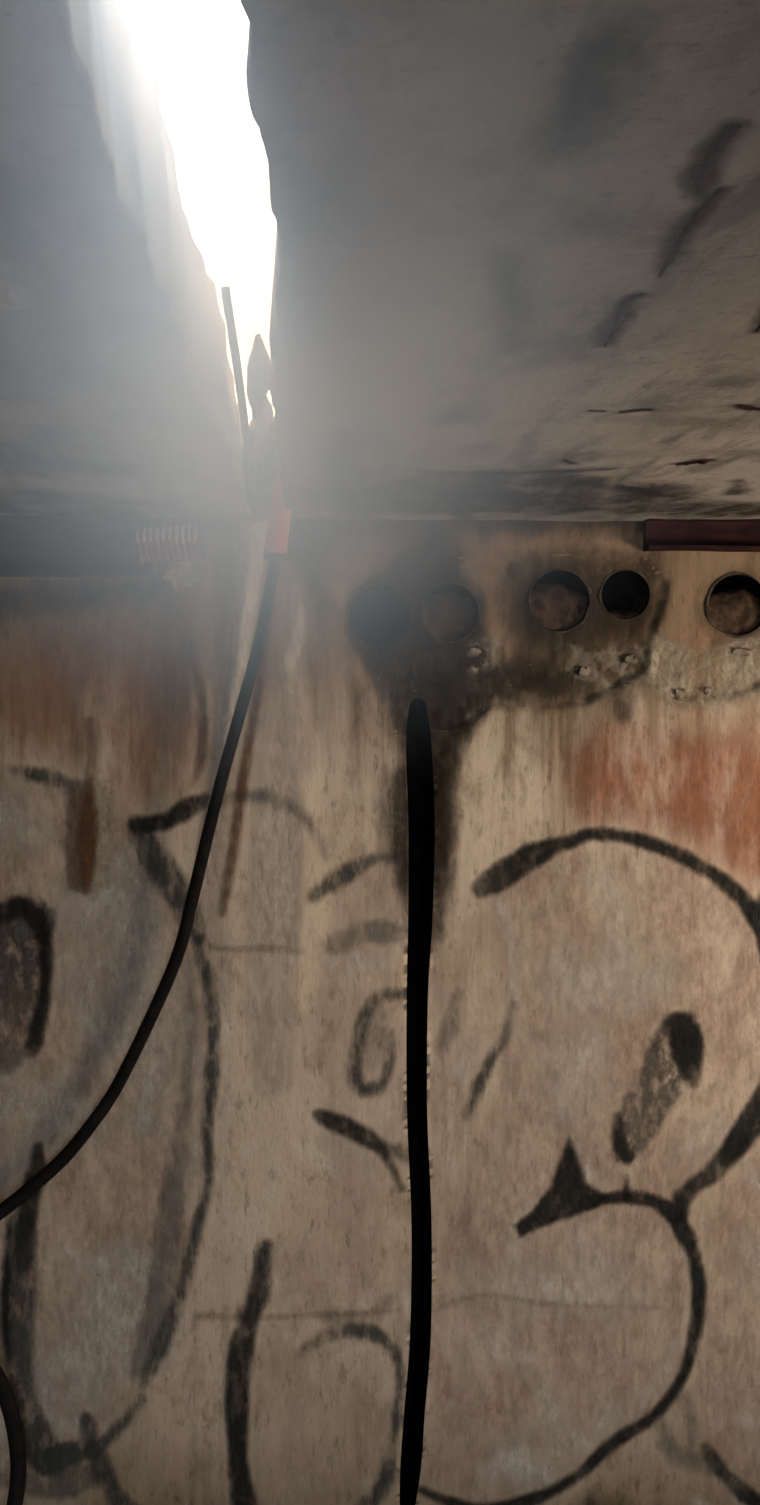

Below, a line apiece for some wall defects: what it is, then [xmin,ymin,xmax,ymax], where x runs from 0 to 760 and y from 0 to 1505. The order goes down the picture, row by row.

corrosion [658,122,749,277]
corrosion [597,293,649,347]
leakage [287,465,760,949]
corrosion [674,754,760,849]